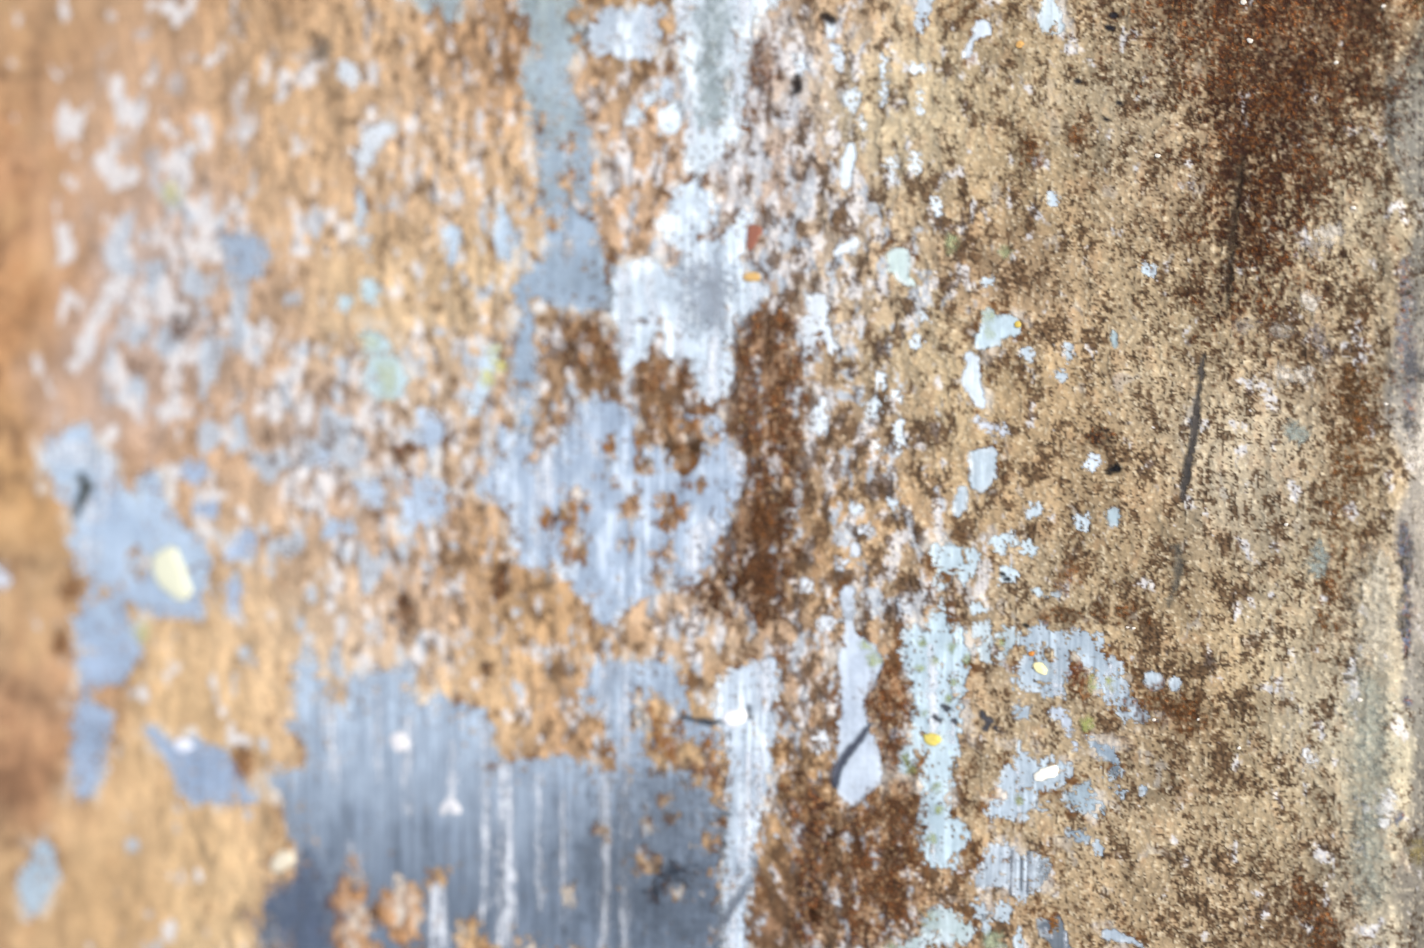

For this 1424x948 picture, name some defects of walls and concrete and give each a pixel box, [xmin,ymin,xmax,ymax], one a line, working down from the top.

peeling [962,20,992,58]
peeling [466,0,779,630]
peeling [798,293,839,436]
peeling [887,247,915,286]
peeling [952,308,1021,517]
peeling [1084,453,1122,475]
rust [1100,0,1424,363]
water stain [1405,347,1424,500]
peeling [39,420,261,805]
peeling [143,645,782,948]
peeling [833,538,1181,903]
peeling [889,904,977,948]